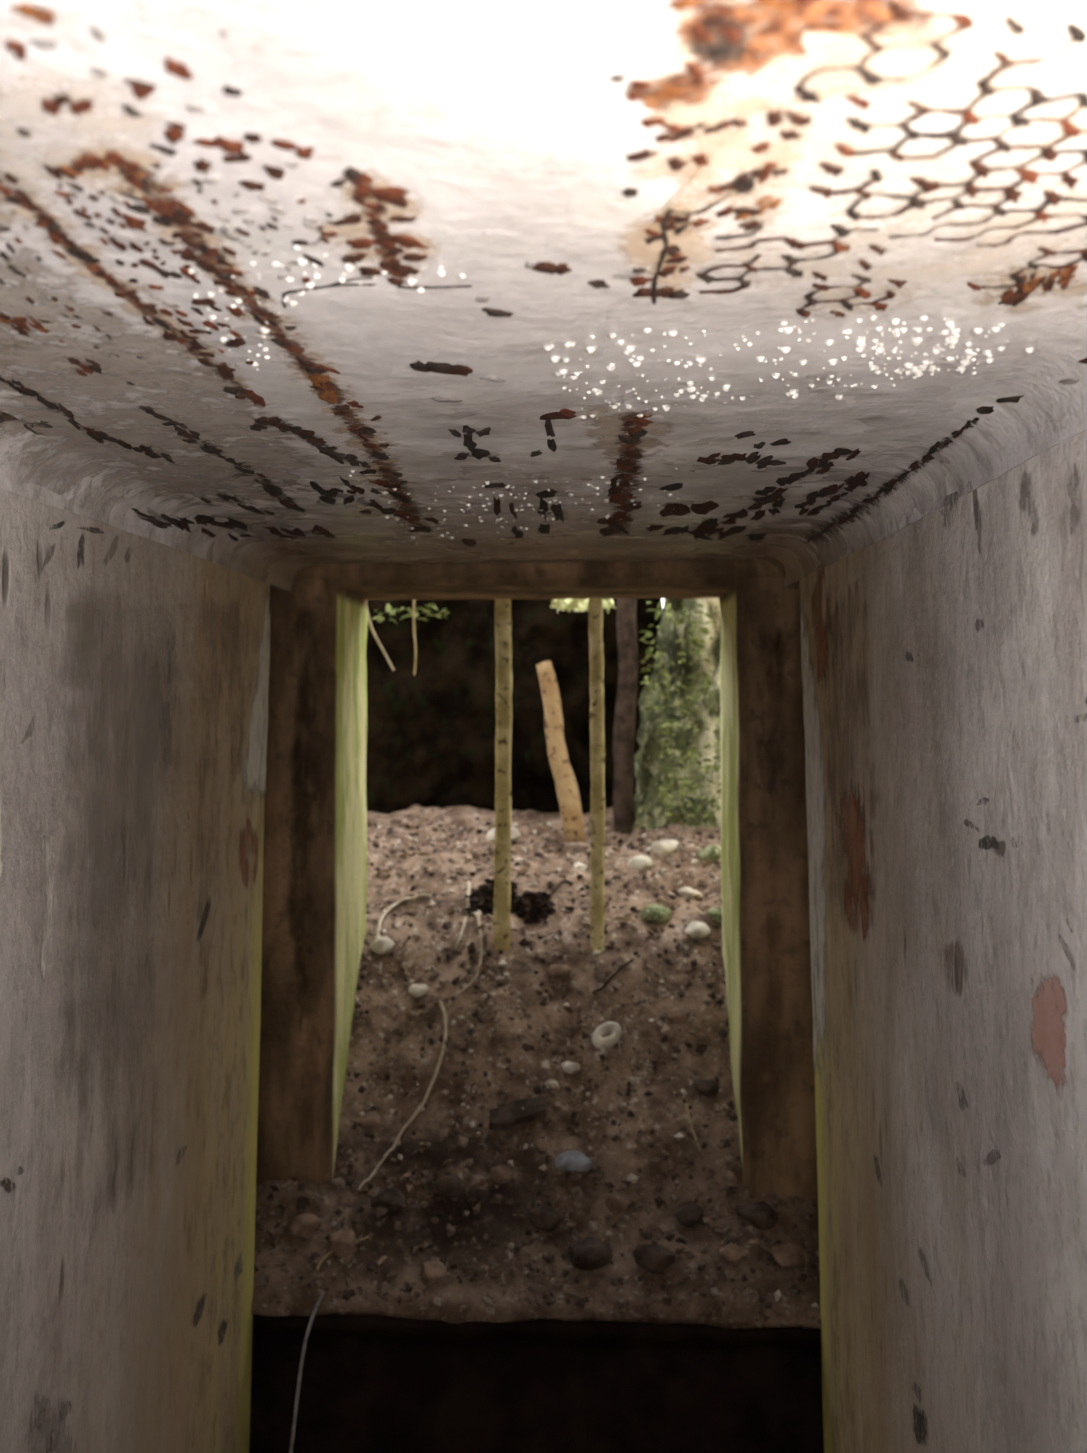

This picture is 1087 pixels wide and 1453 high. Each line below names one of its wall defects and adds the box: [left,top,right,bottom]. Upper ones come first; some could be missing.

spalling [609,0,950,232]
rust [0,148,441,533]
rust [530,395,1024,678]
rust [839,788,872,939]
spalling [1032,923,1074,1087]